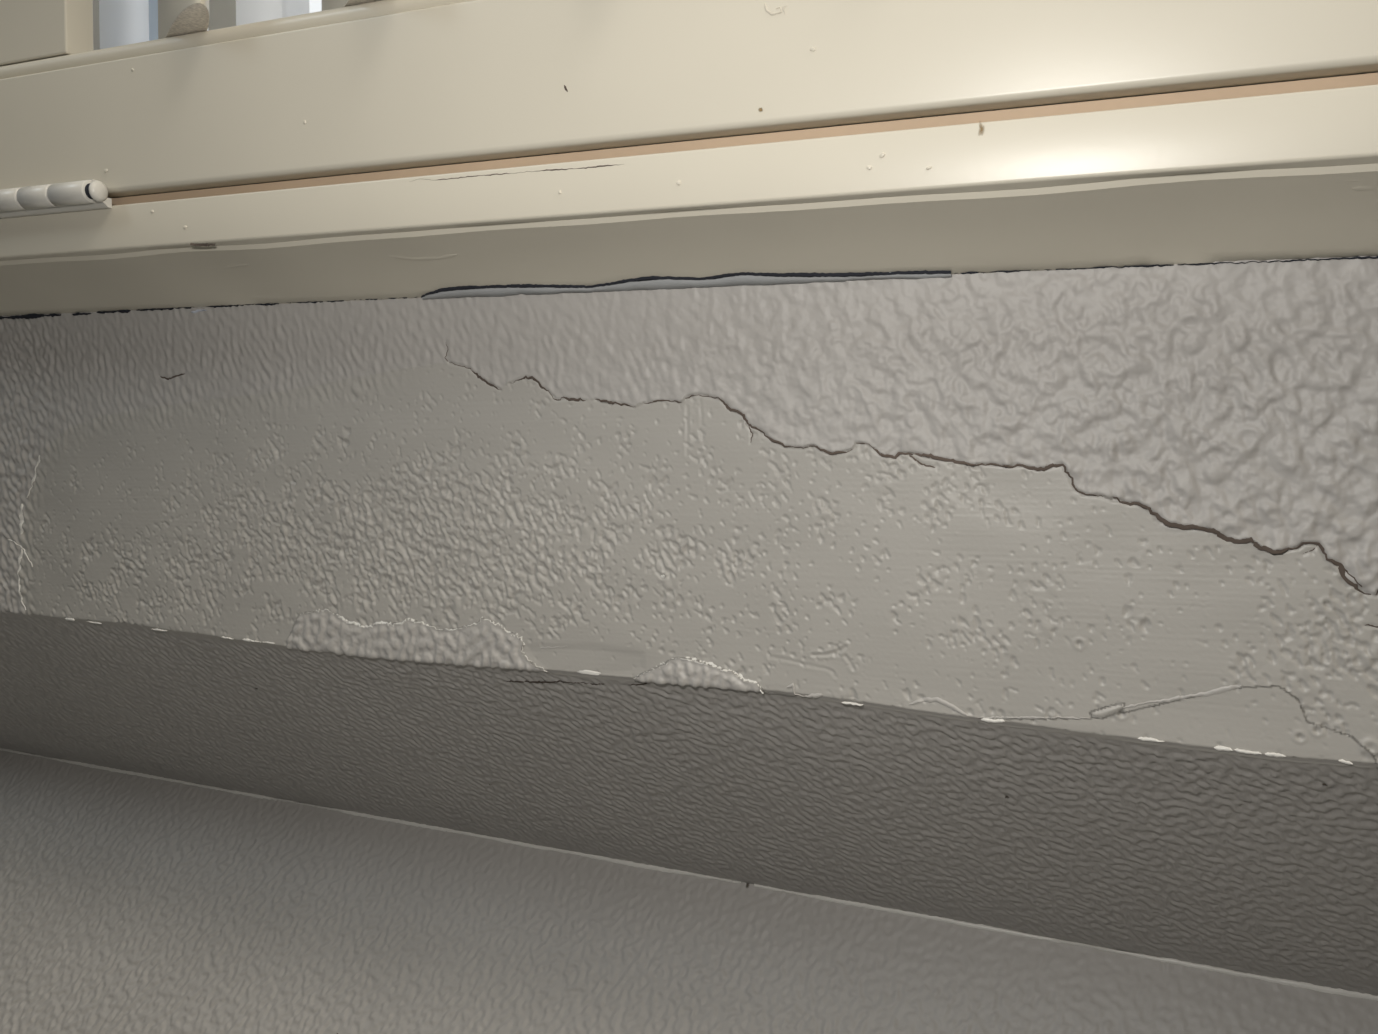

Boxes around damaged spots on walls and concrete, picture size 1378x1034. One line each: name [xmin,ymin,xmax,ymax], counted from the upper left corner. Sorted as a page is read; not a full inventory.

crack [0,256,1378,320]
spalling [1214,745,1286,758]